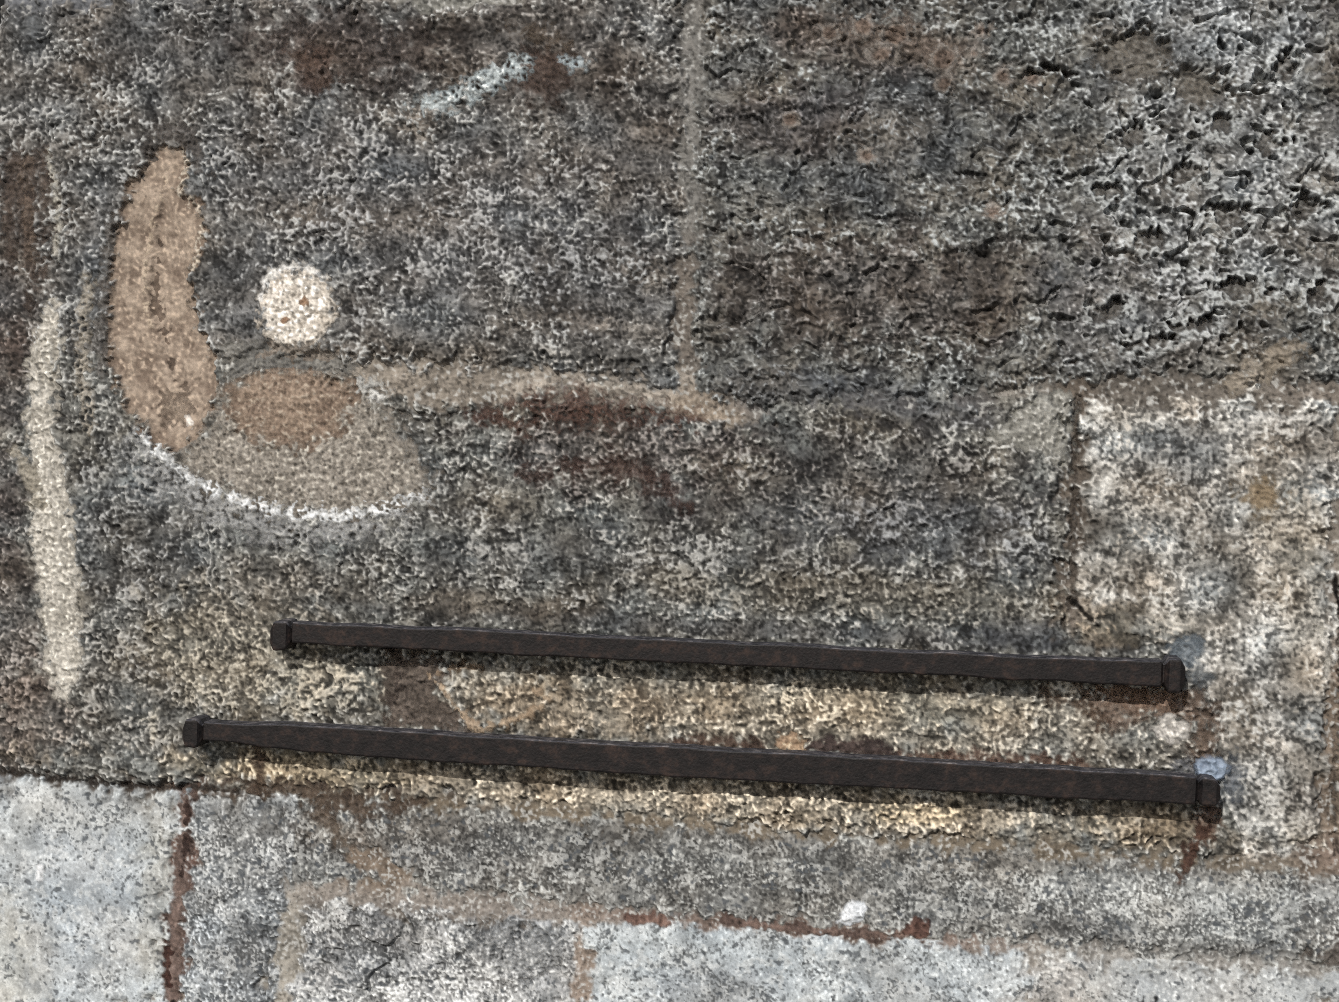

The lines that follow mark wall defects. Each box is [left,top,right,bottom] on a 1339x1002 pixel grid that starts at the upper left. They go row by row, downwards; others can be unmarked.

rust [162,788,198,1002]
rust [624,910,671,927]
rust [720,913,930,943]